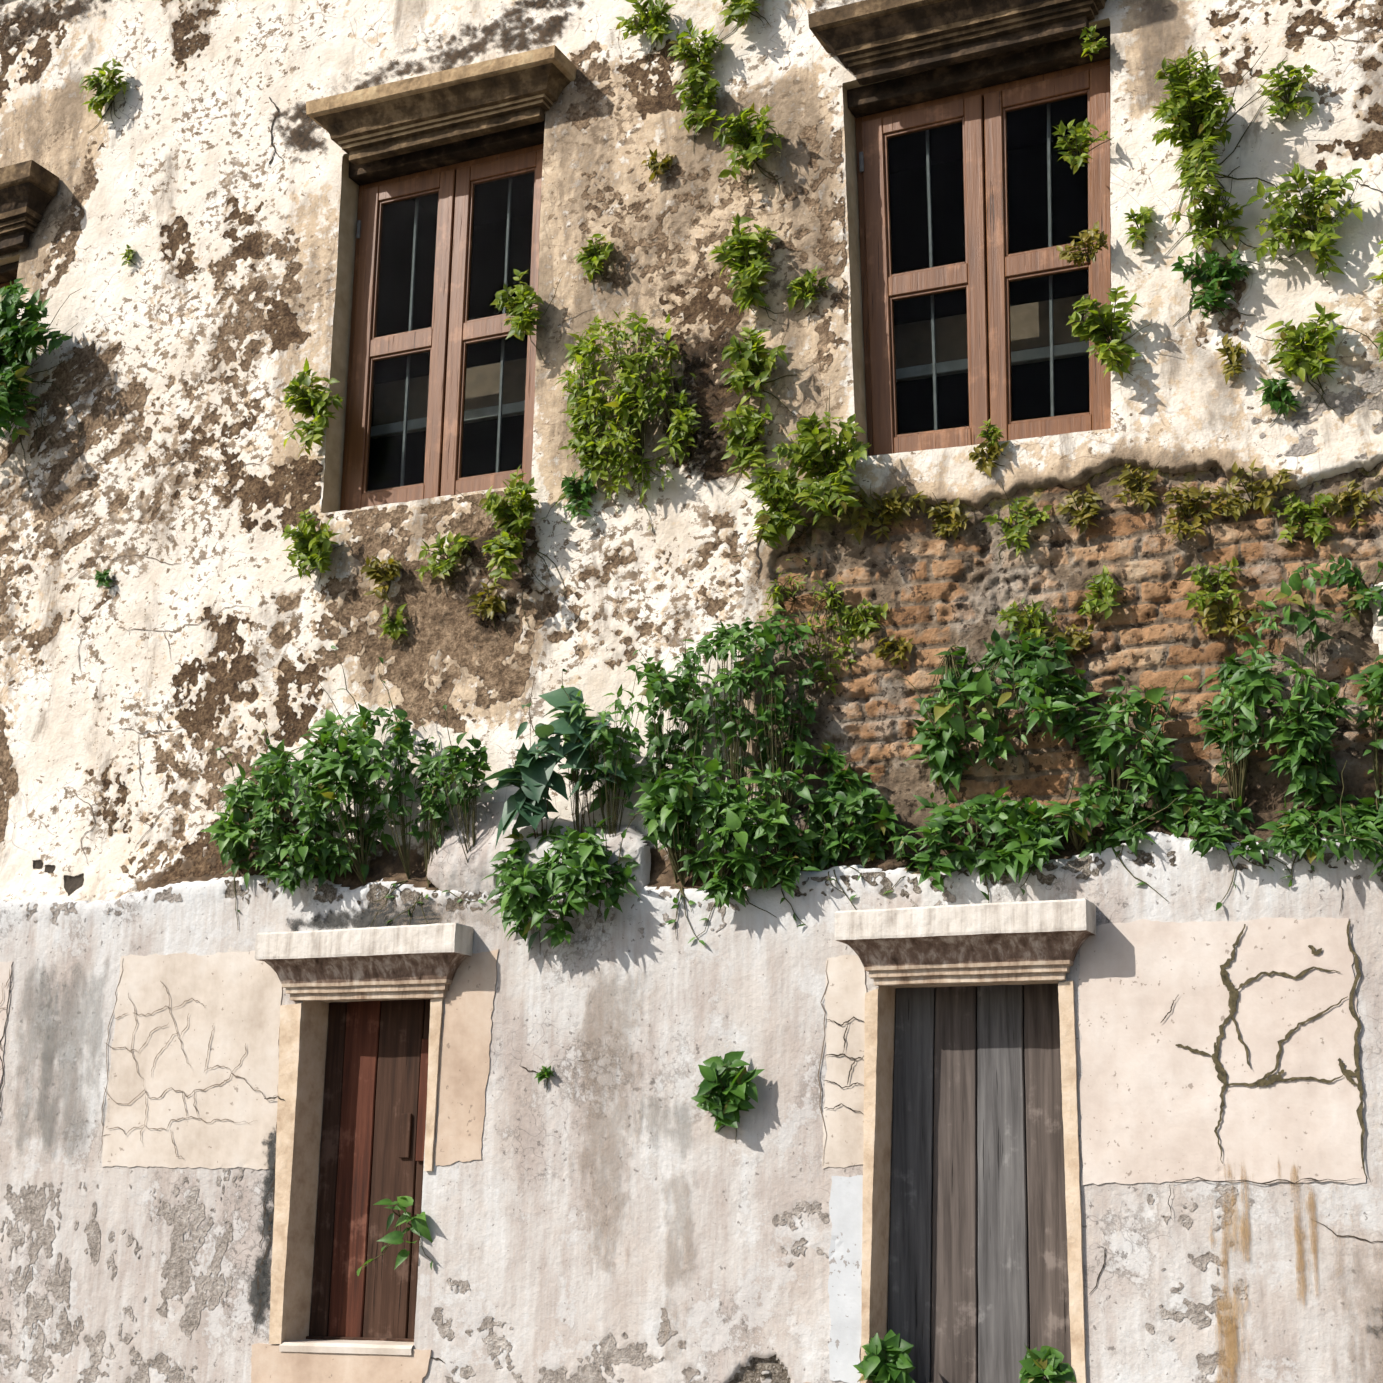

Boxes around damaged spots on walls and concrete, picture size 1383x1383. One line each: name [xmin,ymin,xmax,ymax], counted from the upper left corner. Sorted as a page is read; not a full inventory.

peeling [1206,0,1383,173]
peeling [0,196,683,916]
flaking render [655,452,1383,907]
crack [98,958,285,1333]
water stain [248,1132,276,1324]
peeling [431,1307,686,1383]
flaking render [728,1355,791,1383]
crack [817,960,864,1160]
rust [1218,1294,1238,1383]
crack [1161,885,1368,1210]
rust [1295,1194,1317,1304]
crack [1310,1218,1383,1243]